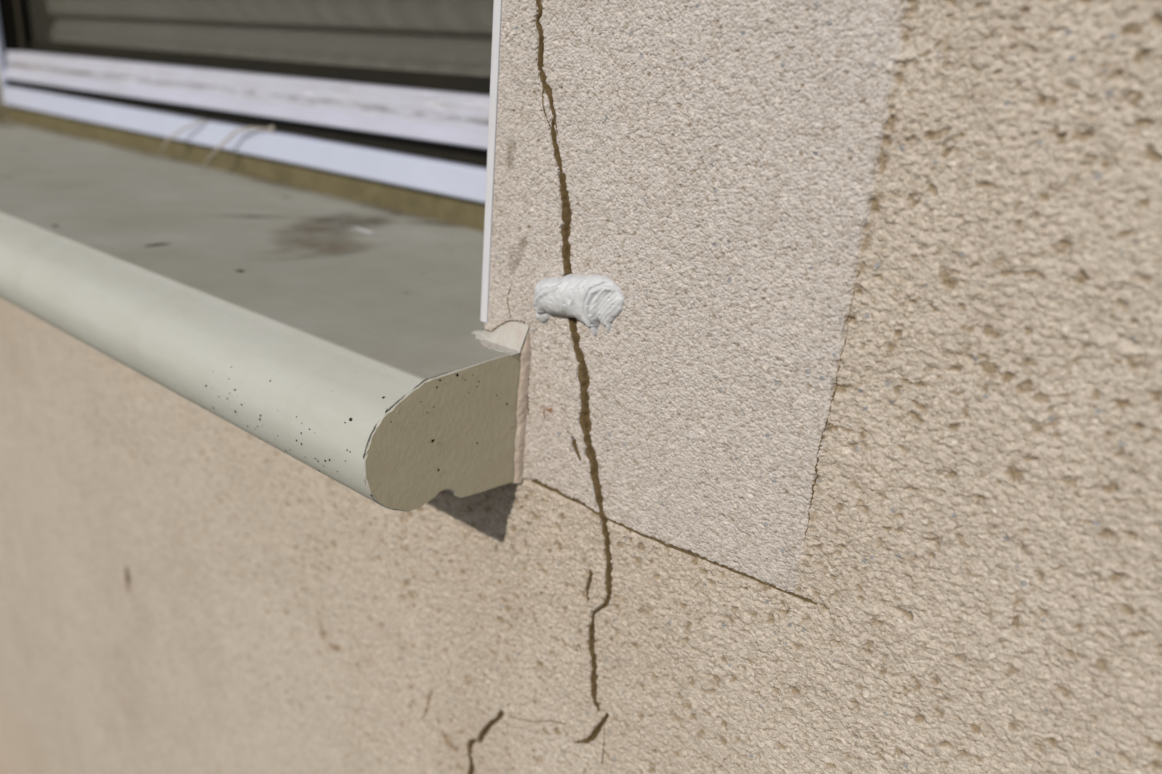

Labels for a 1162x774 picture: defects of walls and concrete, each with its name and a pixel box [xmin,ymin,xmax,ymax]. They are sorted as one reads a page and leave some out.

crack [536,0,572,276]
crack [468,317,817,774]